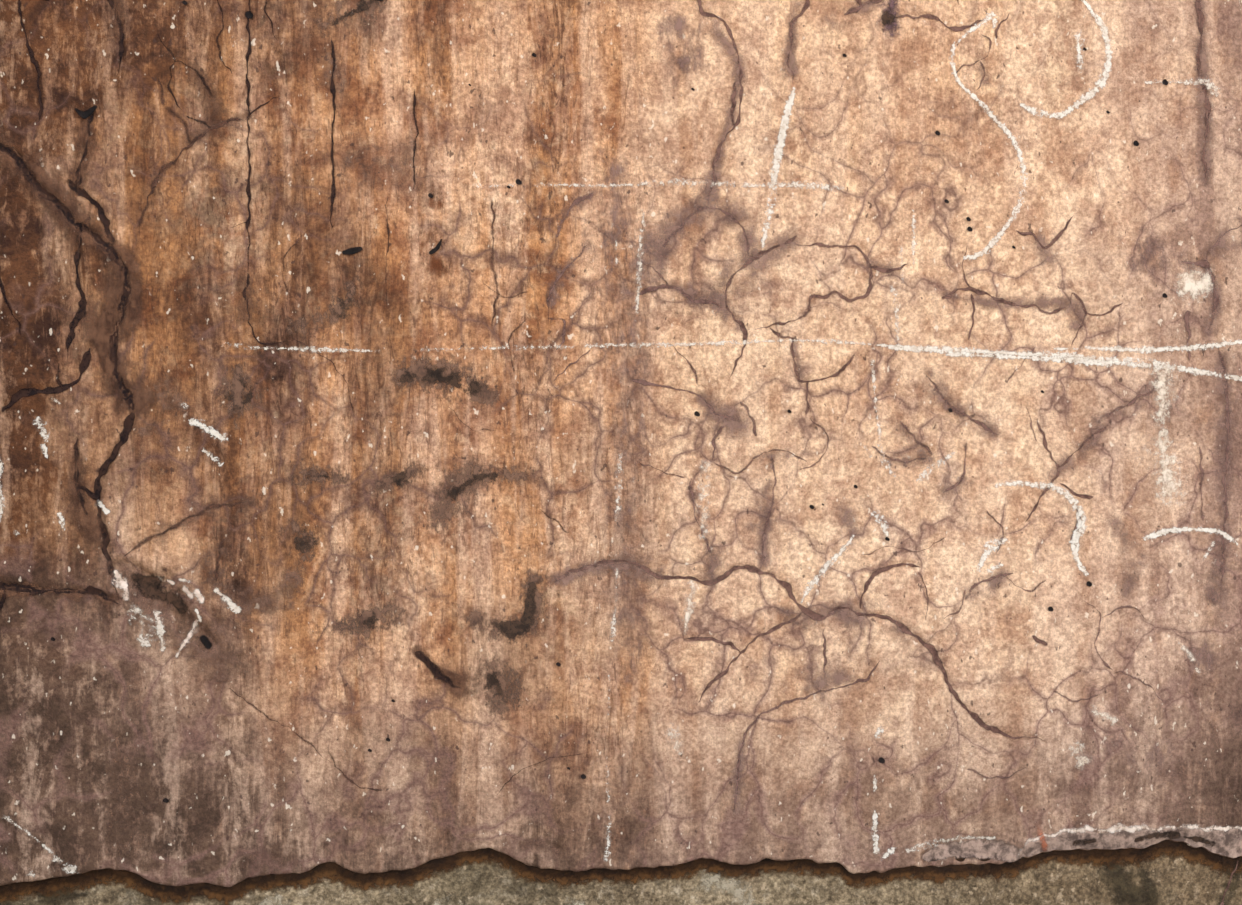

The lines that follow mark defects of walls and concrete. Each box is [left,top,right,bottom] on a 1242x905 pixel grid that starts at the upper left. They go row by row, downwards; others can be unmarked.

crack [412,89,420,184]
crack [0,0,353,610]
crack [383,198,391,302]
crack [486,193,593,380]
crack [551,0,1242,812]
crack [413,646,478,697]
spalling [906,823,1242,862]